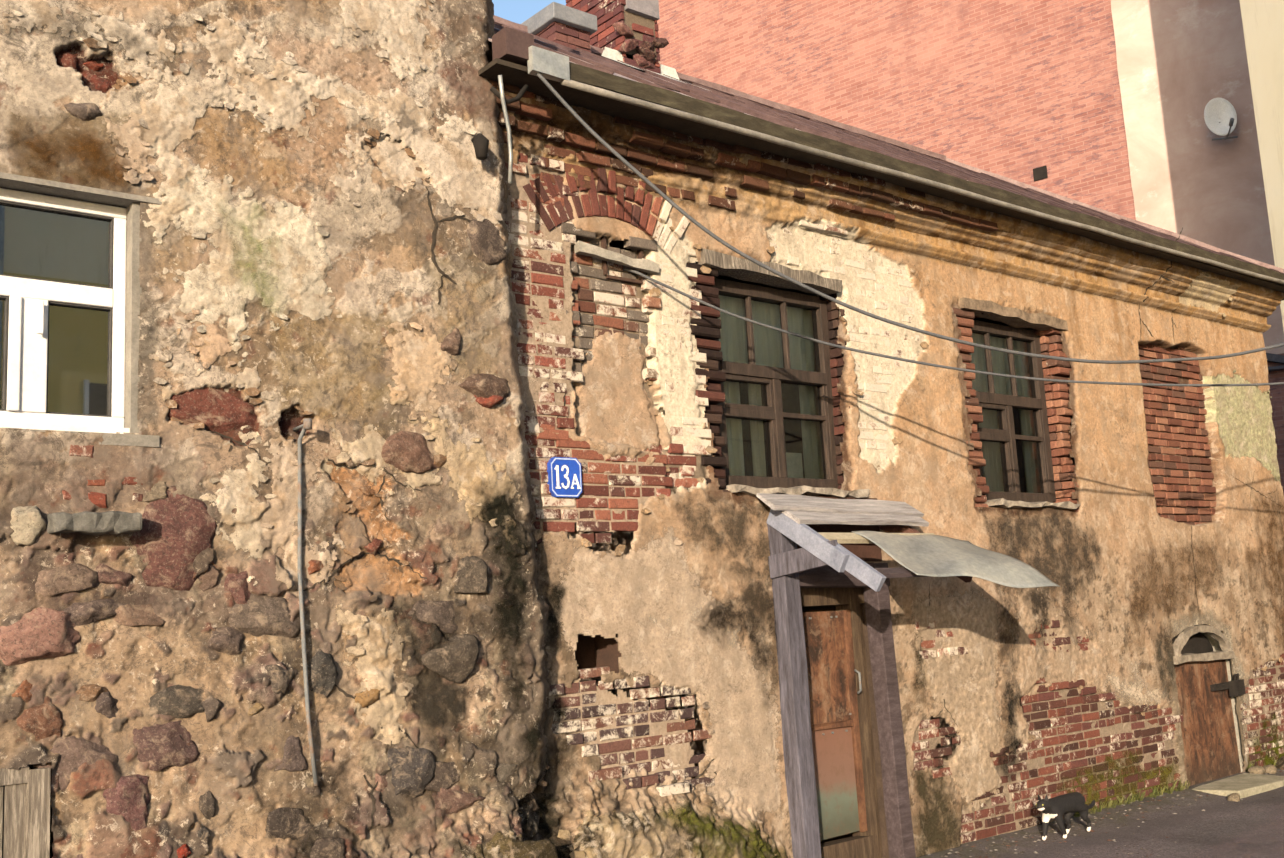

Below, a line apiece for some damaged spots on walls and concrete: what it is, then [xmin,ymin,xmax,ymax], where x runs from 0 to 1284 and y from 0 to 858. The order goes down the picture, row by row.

crack [368,132,473,304]
peeling [2,0,787,830]
spalling [766,218,929,472]
leakage [393,608,467,745]
leakage [480,491,565,667]
spalling [517,802,546,841]
leakage [523,700,575,858]
leakage [674,490,777,668]
leakage [997,584,1018,651]
leakage [987,508,1100,640]
spalling [911,587,1184,845]
spalling [1240,653,1284,773]